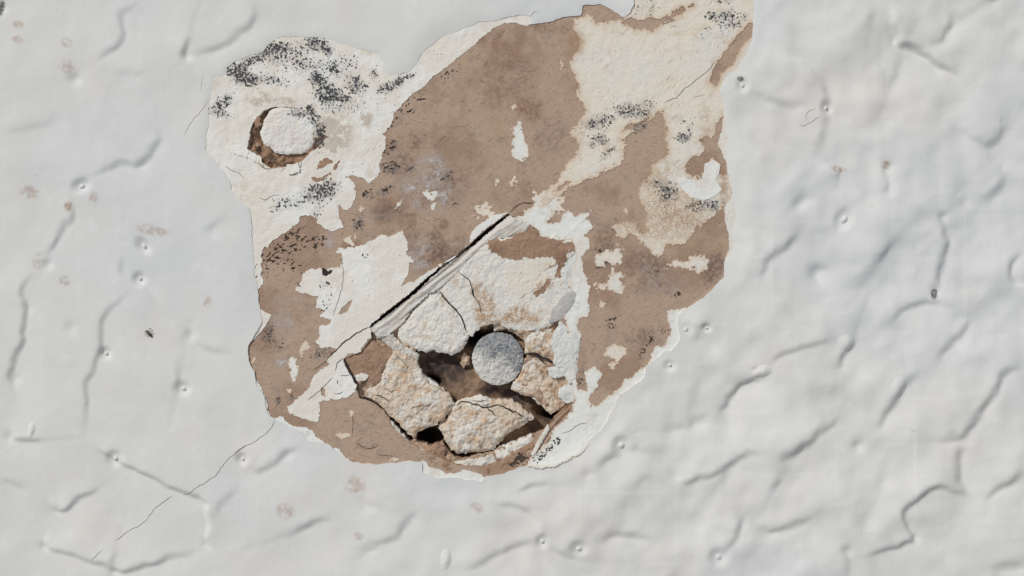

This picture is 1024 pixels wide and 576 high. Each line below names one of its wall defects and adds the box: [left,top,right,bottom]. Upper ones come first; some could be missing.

leakage [208,37,414,152]
leakage [580,98,657,160]
peeling [205,0,754,481]
leakage [646,178,726,213]
crack [310,202,535,457]
crack [526,352,553,364]